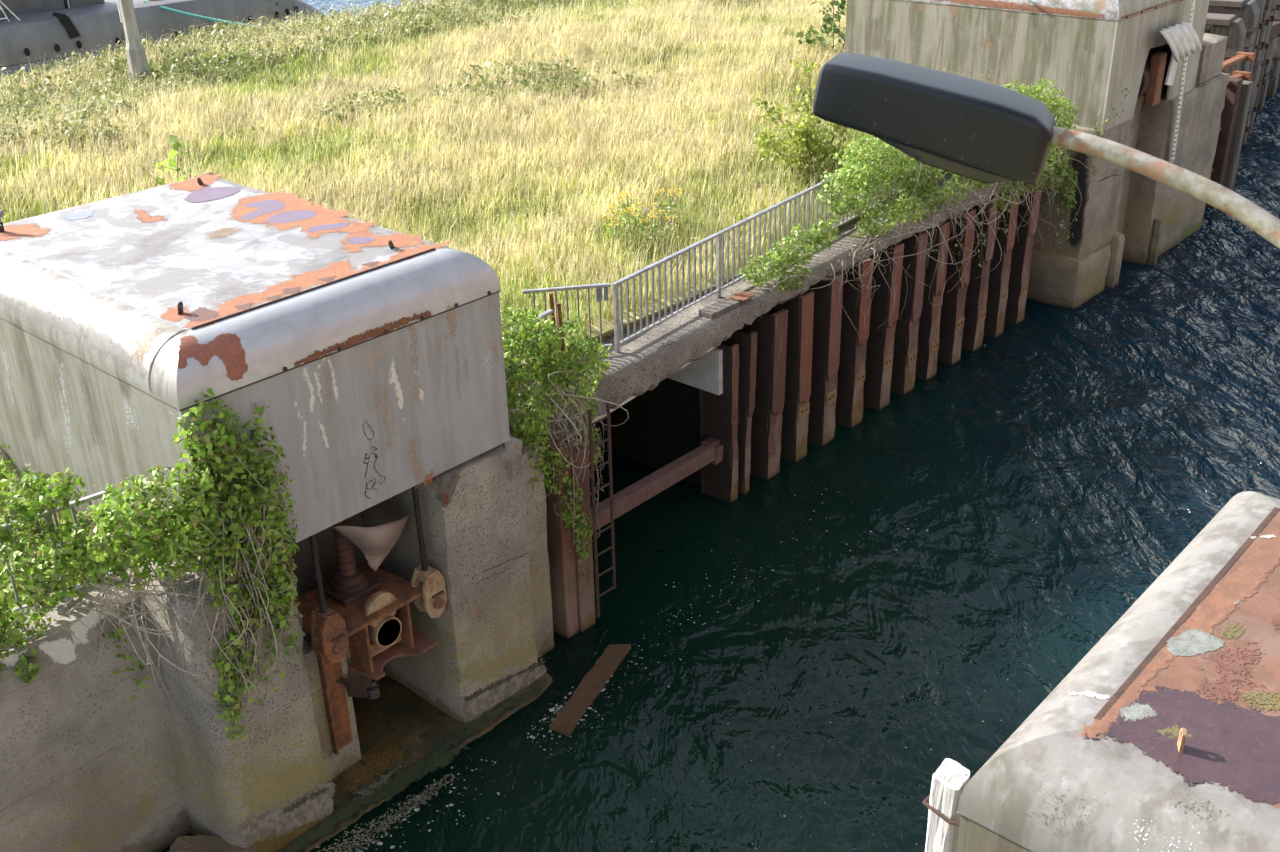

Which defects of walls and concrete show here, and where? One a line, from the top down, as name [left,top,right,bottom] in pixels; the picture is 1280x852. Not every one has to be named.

rust [0,223,59,242]
peeling [184,186,241,203]
rust [129,191,458,371]
rust [293,303,460,490]
rust [1079,530,1280,739]